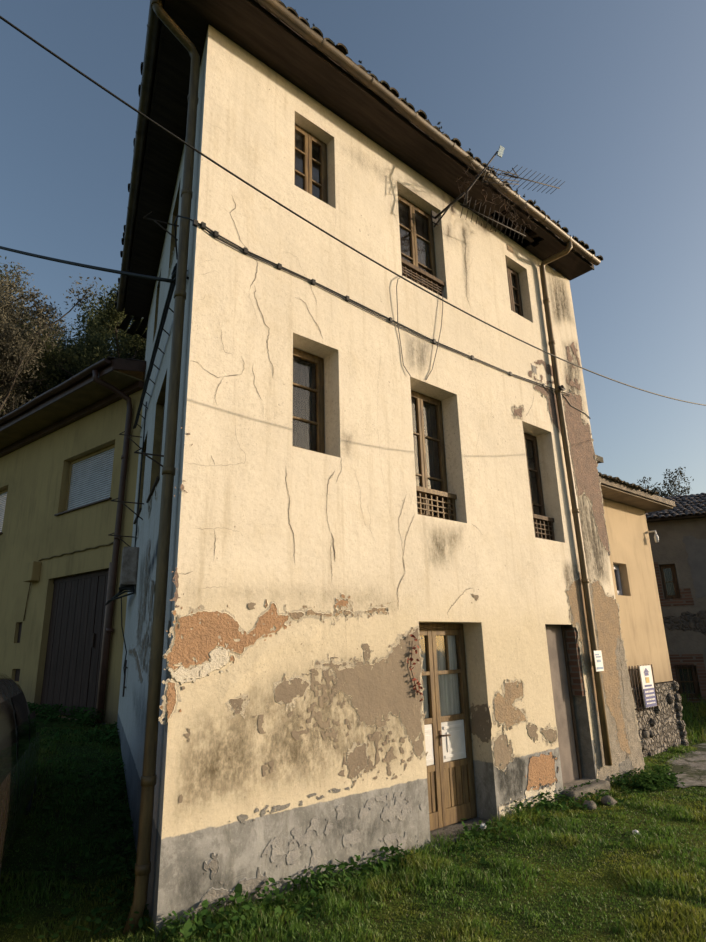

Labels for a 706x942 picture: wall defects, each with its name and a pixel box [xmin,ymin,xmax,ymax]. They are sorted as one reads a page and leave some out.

crack [194,200,273,396]
spalling [528,342,611,556]
peeling [128,525,155,685]
spalling [159,568,389,733]
spalling [662,610,706,635]
peeling [180,625,428,926]
spalling [469,678,559,821]